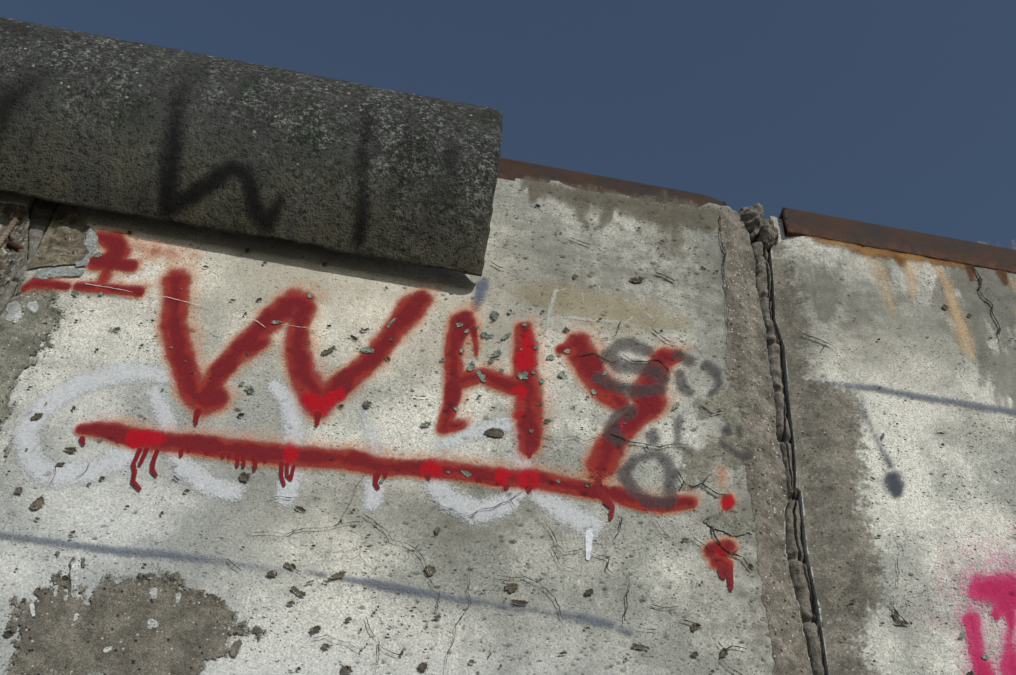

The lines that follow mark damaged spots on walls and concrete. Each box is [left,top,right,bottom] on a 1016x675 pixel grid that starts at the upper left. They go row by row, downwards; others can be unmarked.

peeling [0,203,102,473]
rust [809,234,976,358]
water stain [933,263,1016,407]
spalling [30,495,44,520]
peeling [675,206,912,675]
peeling [0,551,269,675]